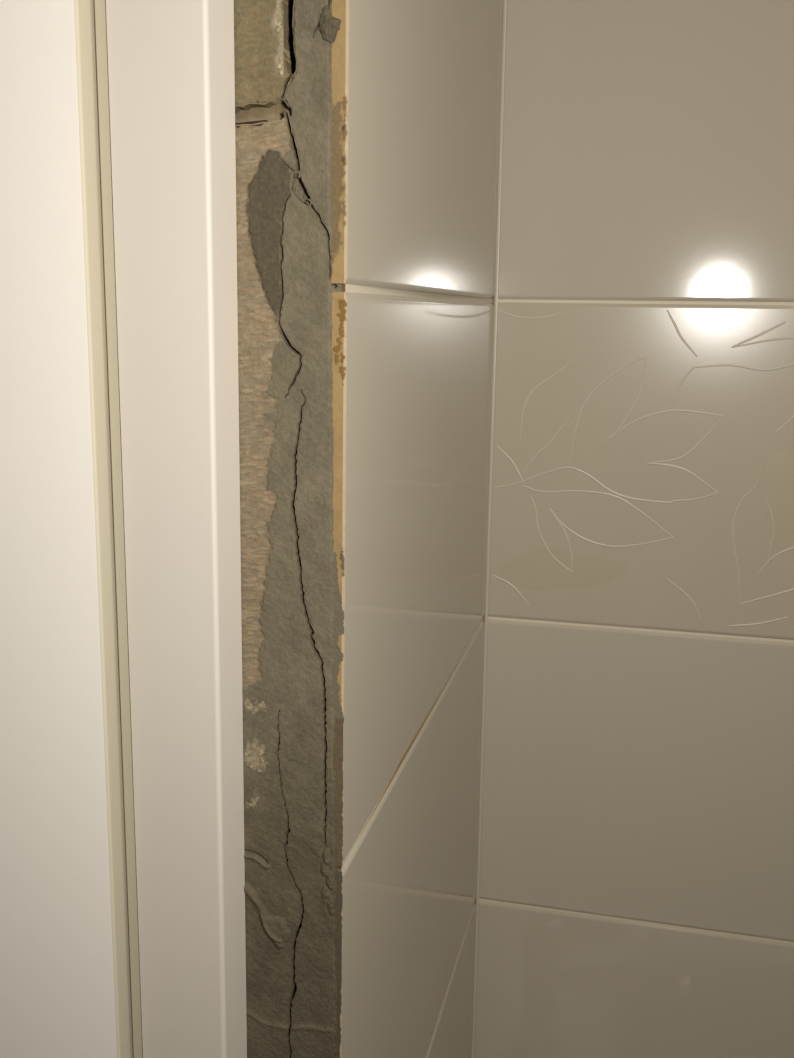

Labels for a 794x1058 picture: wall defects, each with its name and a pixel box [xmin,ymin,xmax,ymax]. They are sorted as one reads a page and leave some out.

spalling [271,0,284,77]
spalling [289,171,313,208]
crack [276,72,337,848]
peeling [243,738,267,773]
crack [274,711,305,1058]